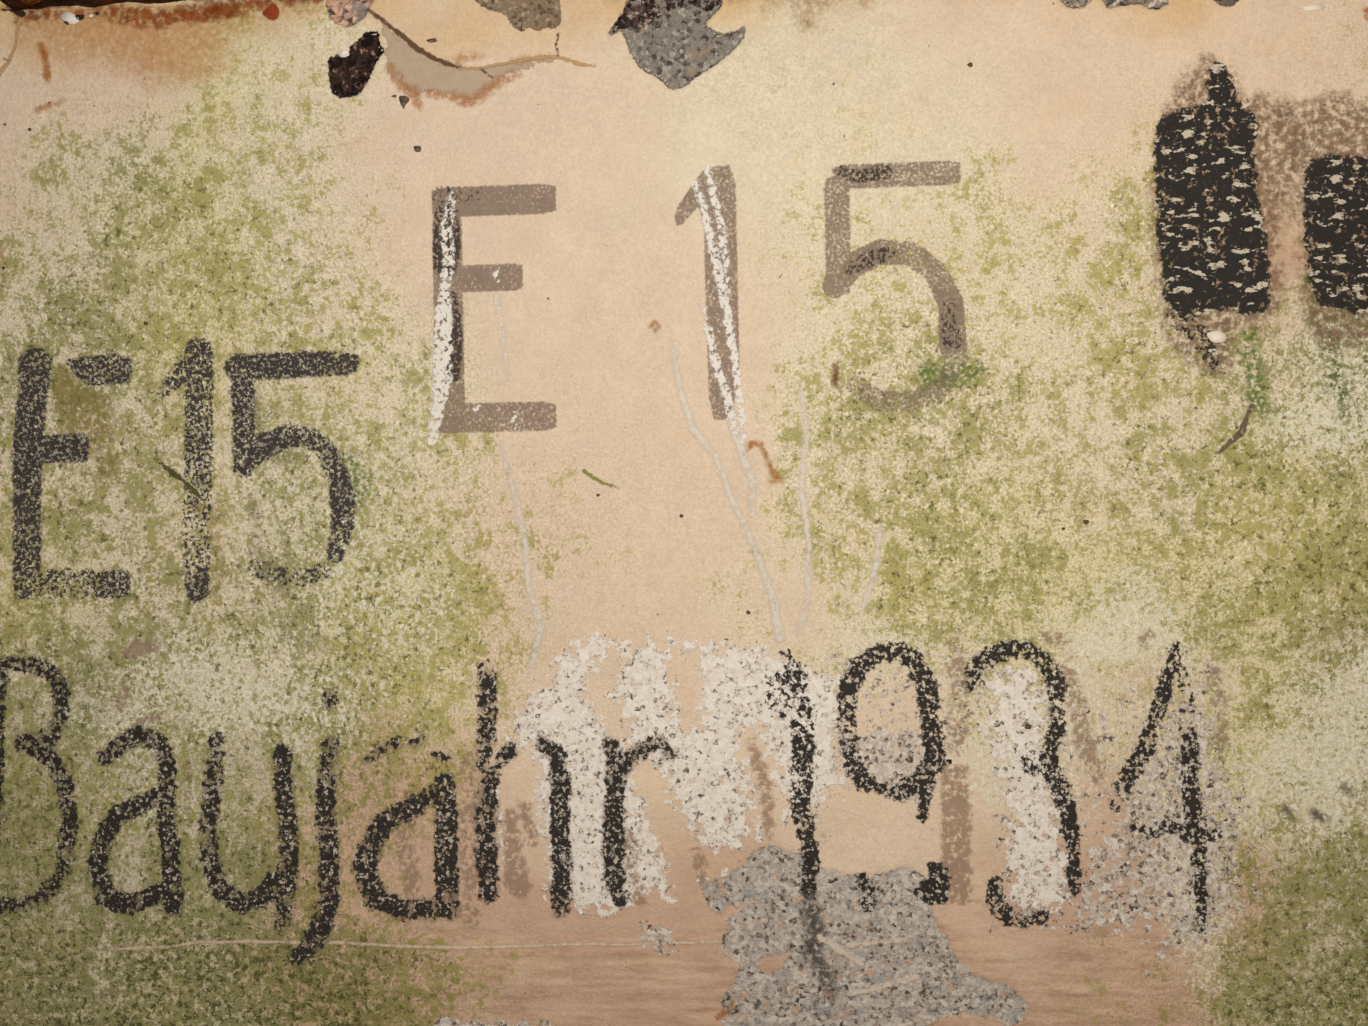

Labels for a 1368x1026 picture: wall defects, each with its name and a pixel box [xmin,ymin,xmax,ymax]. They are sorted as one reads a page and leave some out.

peeling [326,0,562,108]
spalling [609,0,746,90]
spalling [1060,0,1169,10]
leakage [671,346,812,643]
leakage [500,441,544,668]
peeling [490,626,1276,1026]
peeling [433,1015,551,1026]